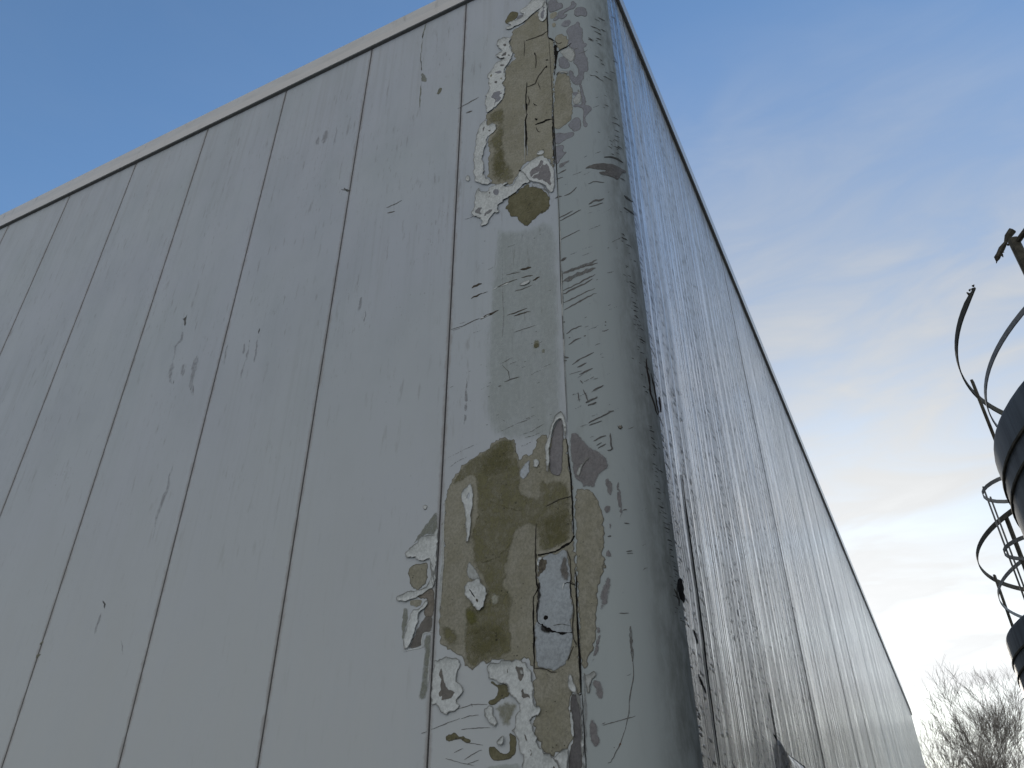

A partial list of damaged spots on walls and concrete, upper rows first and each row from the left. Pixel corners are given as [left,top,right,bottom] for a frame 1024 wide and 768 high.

peeling [465,0,592,226]
crack [519,0,571,171]
peeling [396,411,622,768]
crack [532,437,582,695]